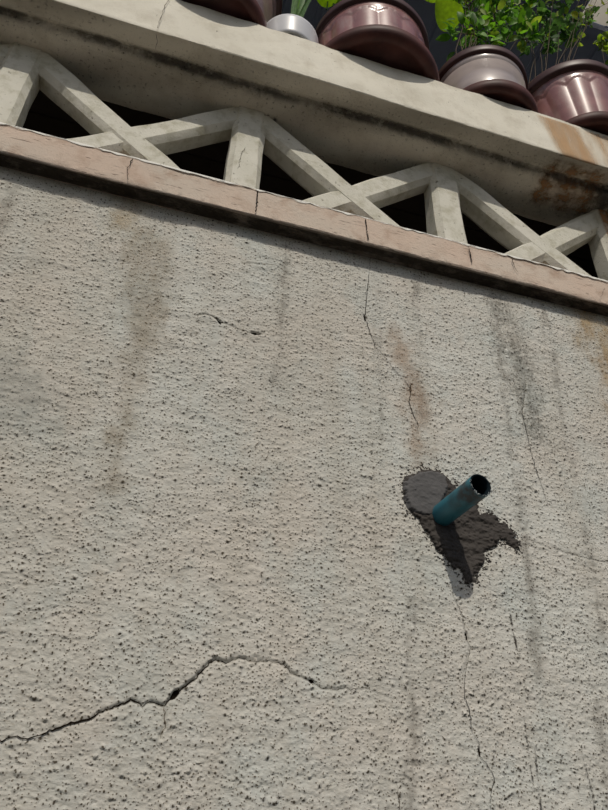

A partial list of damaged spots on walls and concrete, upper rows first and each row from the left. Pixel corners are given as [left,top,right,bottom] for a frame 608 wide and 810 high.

leakage [0,0,32,18]
leakage [75,30,124,60]
leakage [134,47,294,108]
leakage [319,98,451,145]
rust [533,116,604,214]
crack [0,658,402,742]